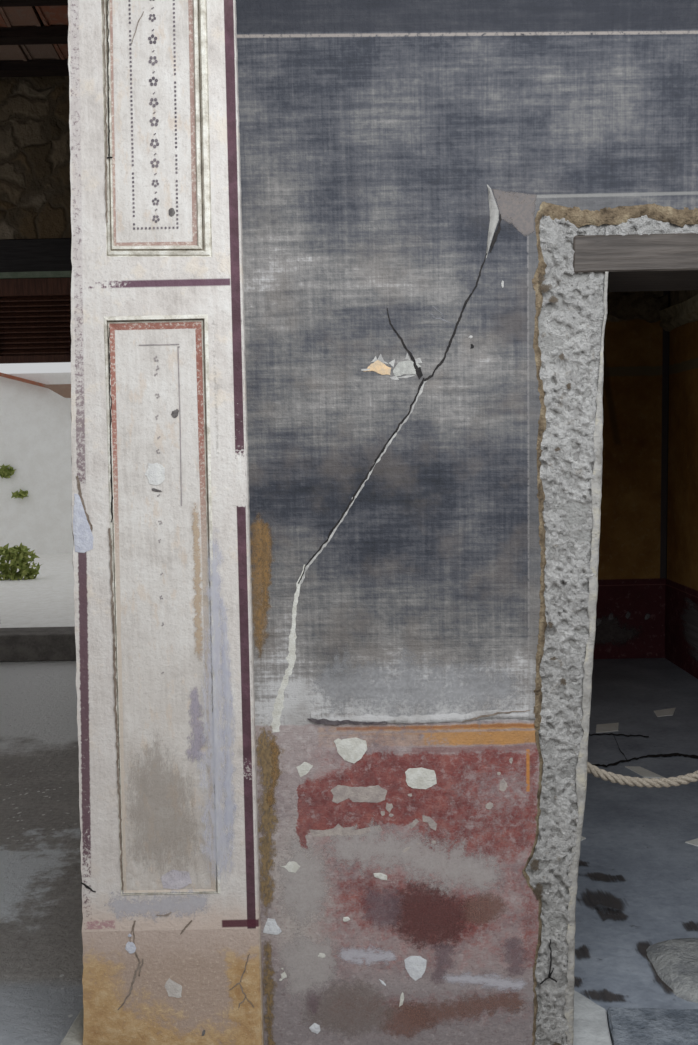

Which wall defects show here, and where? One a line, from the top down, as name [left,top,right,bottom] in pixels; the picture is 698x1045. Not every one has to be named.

flaking render [486,185,502,258]
crack [270,223,499,733]
flaking render [307,202,698,1045]
peeling [296,762,313,777]
crack [118,912,192,1010]
crack [229,954,254,1008]
crack [540,939,557,985]